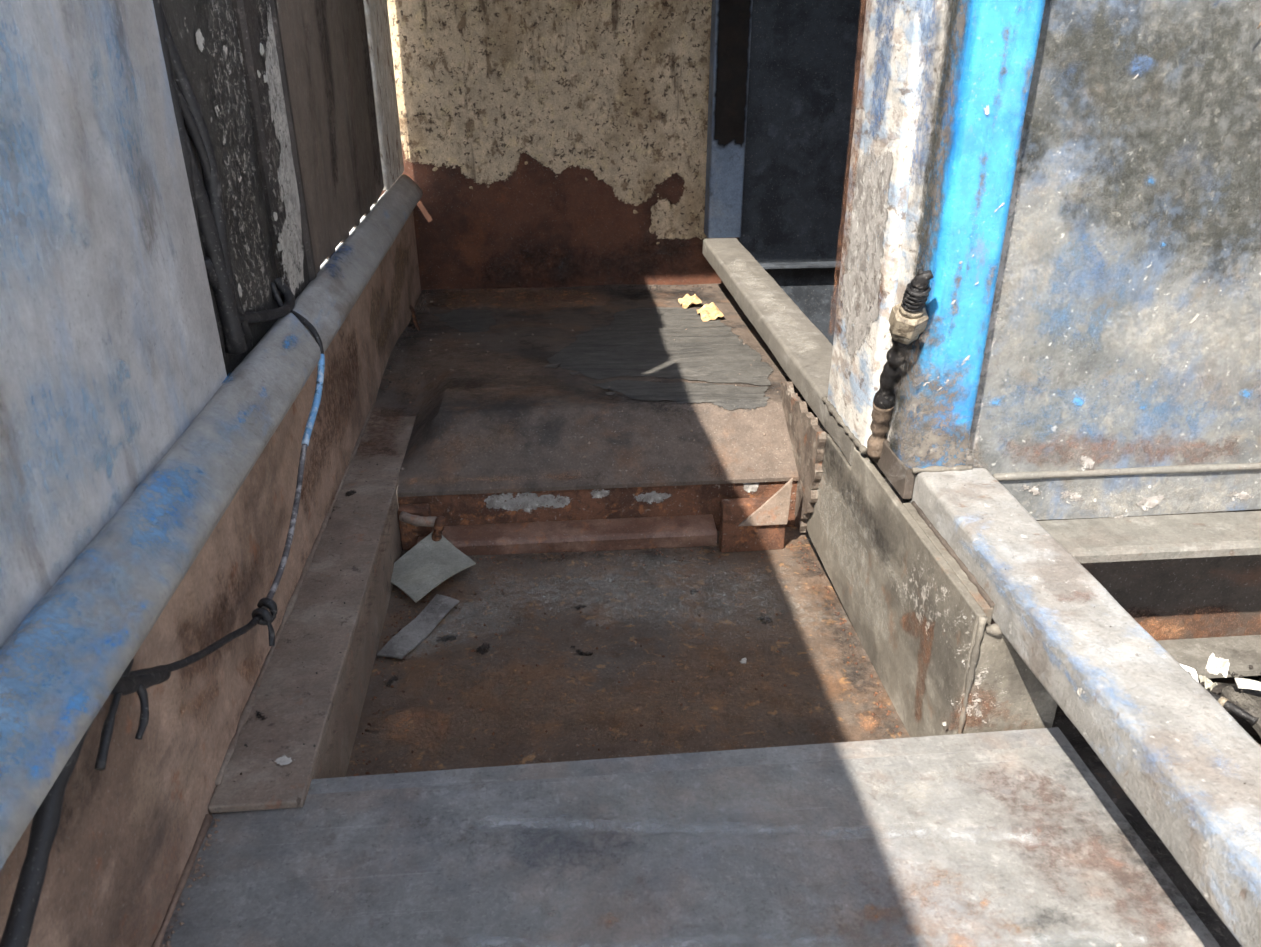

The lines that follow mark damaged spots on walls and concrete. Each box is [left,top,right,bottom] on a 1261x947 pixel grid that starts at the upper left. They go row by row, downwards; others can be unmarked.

peeling [387,0,712,245]
peeling [544,307,774,411]
peeling [1033,933,1123,947]